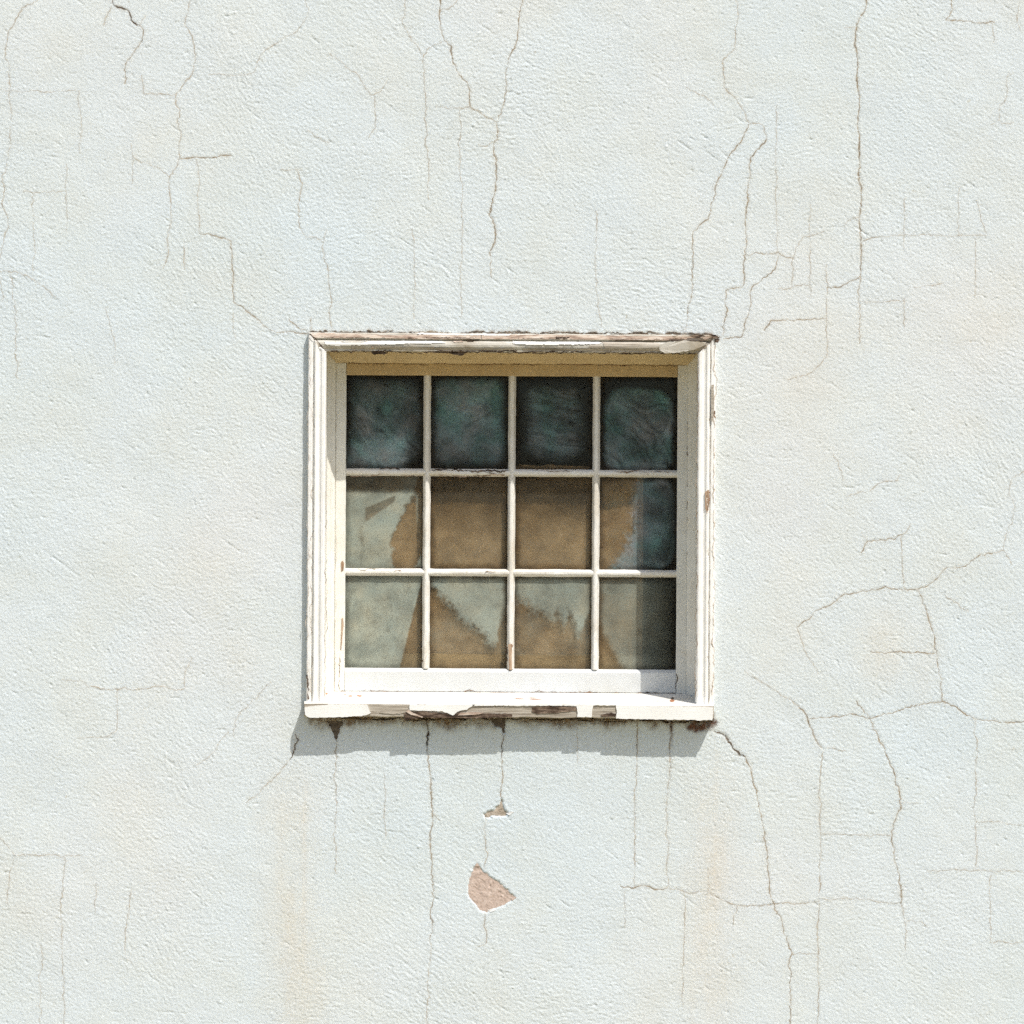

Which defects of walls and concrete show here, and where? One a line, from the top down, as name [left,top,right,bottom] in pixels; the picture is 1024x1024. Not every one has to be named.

crack [104,1,332,334]
crack [403,0,523,274]
crack [686,0,937,379]
crack [426,721,434,936]
spalling [468,863,516,912]
spalling [484,799,513,818]
peeling [409,704,713,733]
crack [708,514,1024,1024]